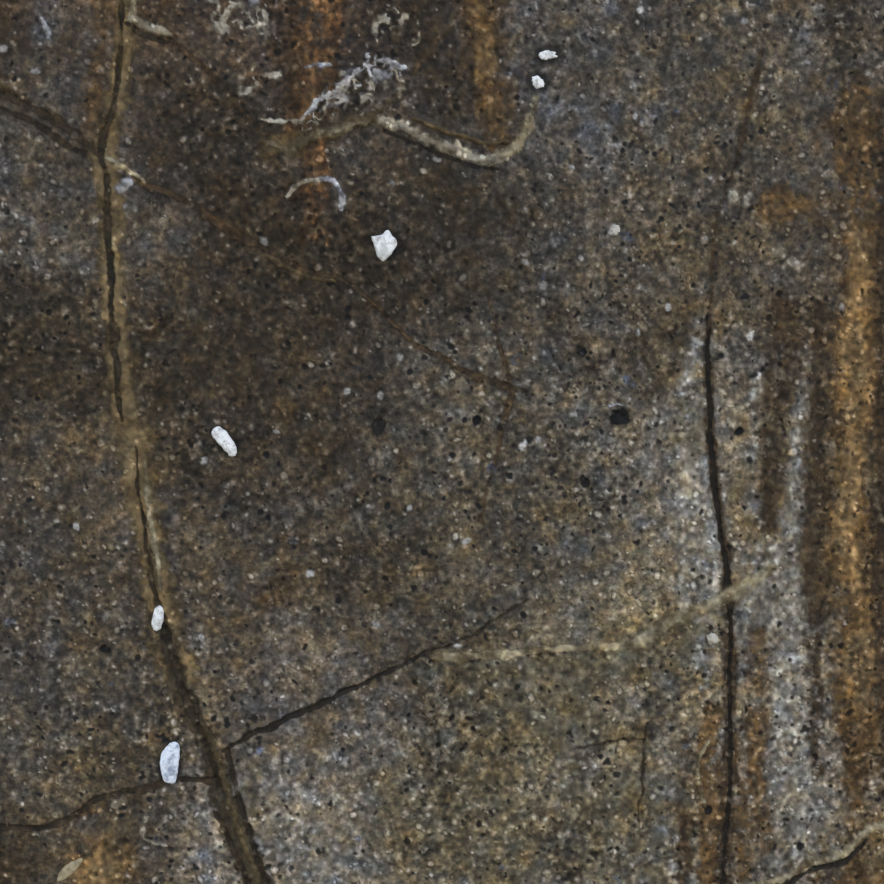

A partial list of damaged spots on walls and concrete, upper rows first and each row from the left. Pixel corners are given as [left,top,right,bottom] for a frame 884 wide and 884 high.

crack [0,0,528,884]
corrosion [462,0,512,150]
crack [735,48,764,164]
crack [697,186,884,884]
corrosion [800,83,884,884]